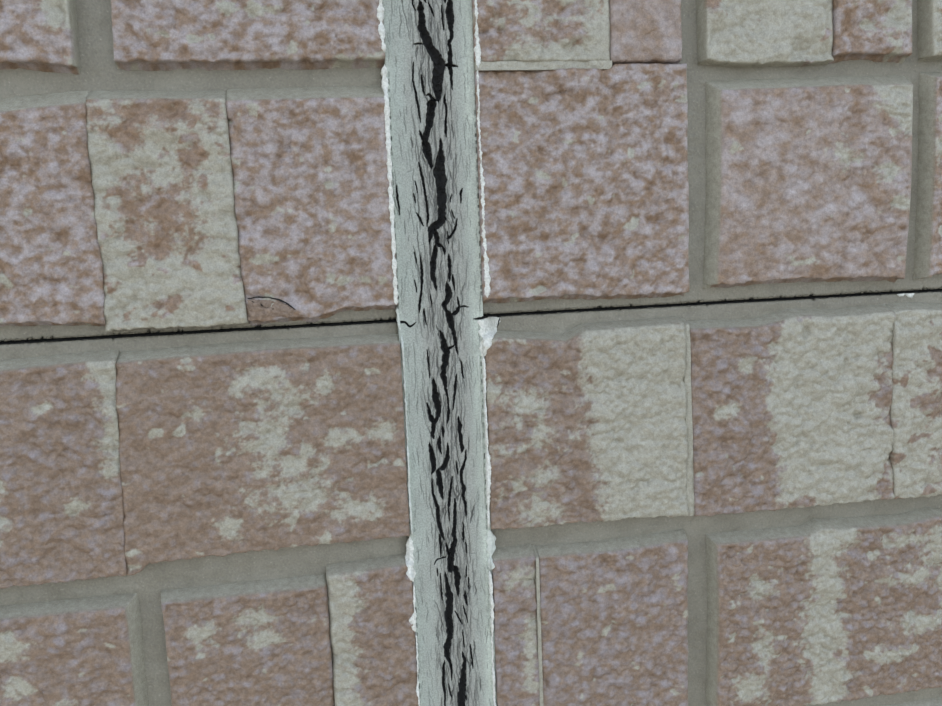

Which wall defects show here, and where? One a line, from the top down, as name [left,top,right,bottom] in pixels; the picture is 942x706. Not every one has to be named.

crack [396,0,500,706]
peeling [477,317,500,706]